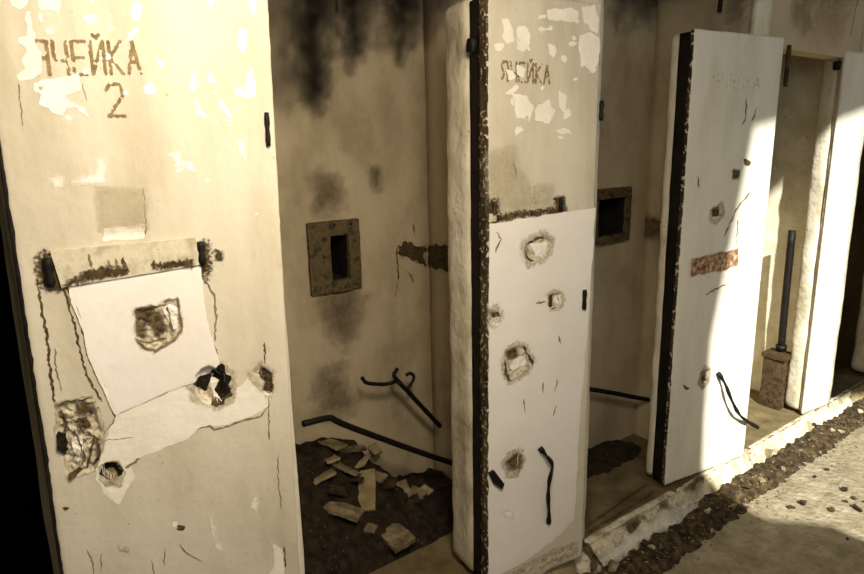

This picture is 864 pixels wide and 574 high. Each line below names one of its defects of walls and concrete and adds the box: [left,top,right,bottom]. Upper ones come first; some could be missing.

peeling [10,0,90,121]
water stain [281,0,377,106]
peeling [494,4,600,73]
peeling [506,65,571,139]
peeling [103,224,145,241]
spalling [397,241,448,272]
spalling [521,232,554,268]
spalling [135,298,183,352]
spalling [536,290,565,311]
spalling [502,343,534,384]
peeling [54,342,274,504]
spalling [502,449,525,478]